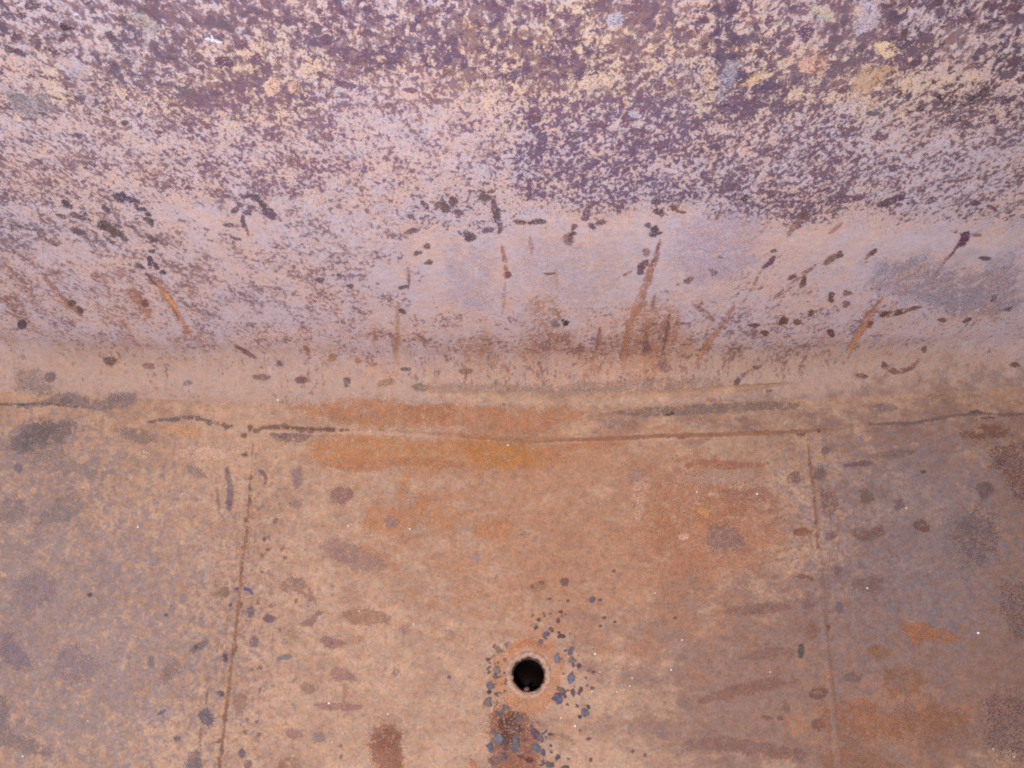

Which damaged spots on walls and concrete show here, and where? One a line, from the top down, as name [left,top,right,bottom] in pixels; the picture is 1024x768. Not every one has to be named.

rust [126,290,154,319]
rust [145,272,190,337]
rust [500,245,511,314]
rust [617,223,687,379]
rust [847,296,925,353]
rust [261,266,831,592]
rust [469,581,595,768]